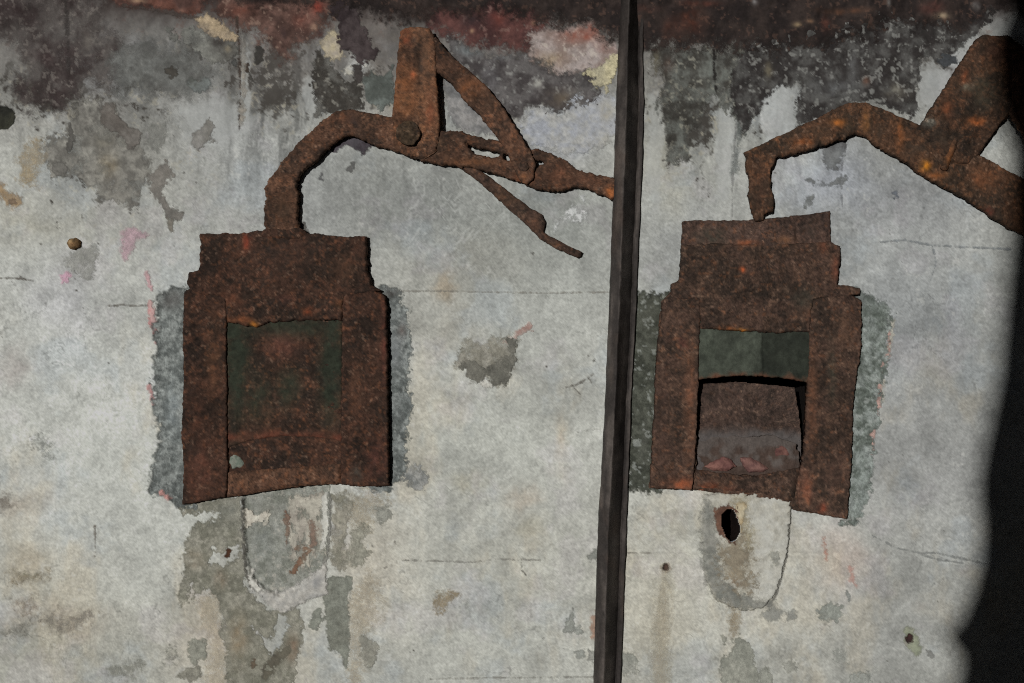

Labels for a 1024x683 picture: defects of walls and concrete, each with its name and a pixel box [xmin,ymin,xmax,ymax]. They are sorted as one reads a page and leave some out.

damp [191,119,215,151]
damp [39,97,183,232]
damp [553,195,587,232]
spalling [713,502,747,545]